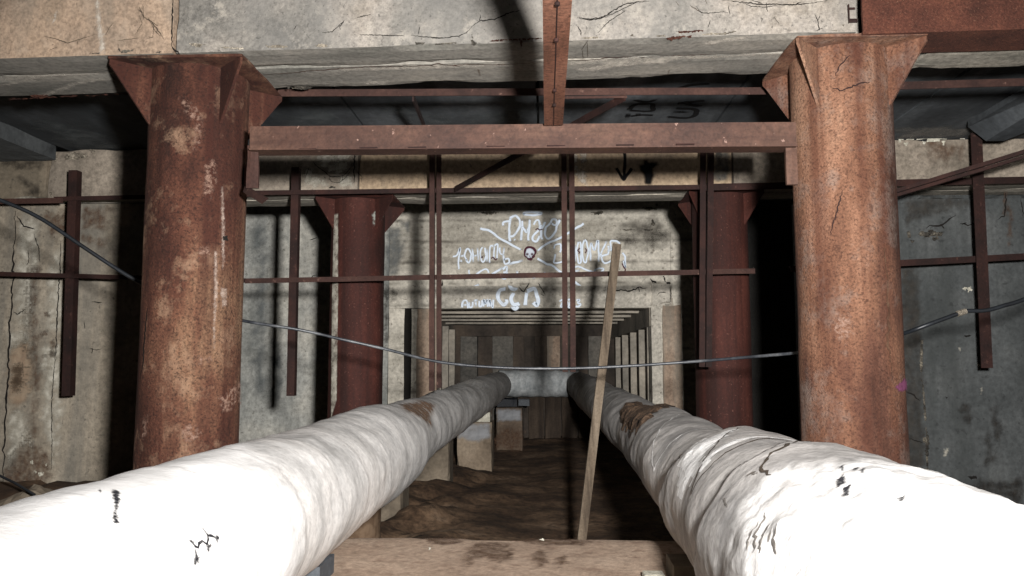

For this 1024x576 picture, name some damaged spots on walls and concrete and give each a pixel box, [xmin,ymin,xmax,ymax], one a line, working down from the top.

crack [578,1,712,61]
crack [927,215,975,239]
crack [2,211,61,476]